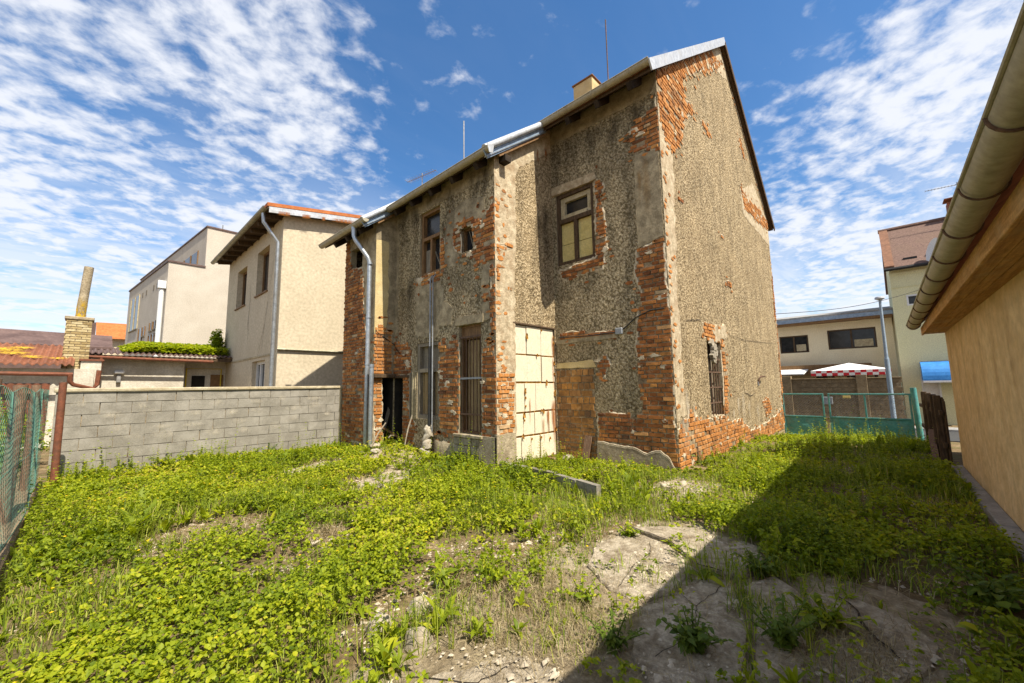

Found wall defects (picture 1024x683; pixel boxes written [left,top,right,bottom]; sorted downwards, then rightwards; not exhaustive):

flaking render [619,50,725,162]
flaking render [732,93,768,231]
flaking render [341,243,418,445]
flaking render [413,183,515,443]
flaking render [557,165,785,469]